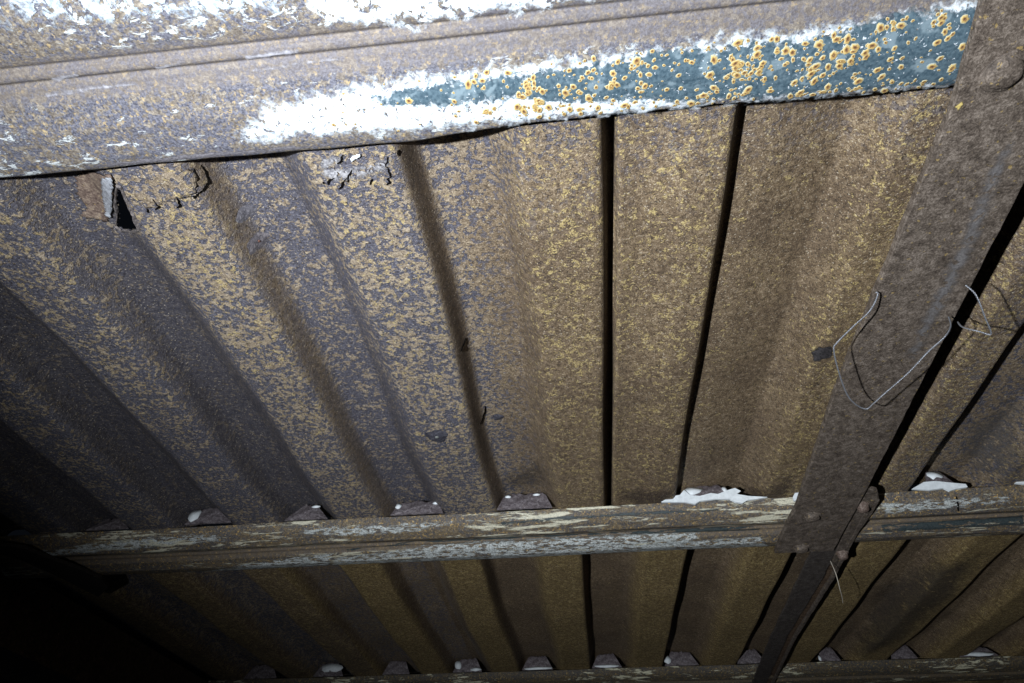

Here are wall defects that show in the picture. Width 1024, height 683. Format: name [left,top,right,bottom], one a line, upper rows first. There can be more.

peeling [243,0,977,143]
crack [322,150,399,189]
peeling [661,486,767,505]
peeling [188,510,201,522]
peeling [304,521,452,536]
peeling [42,533,217,556]
peeling [200,532,769,572]